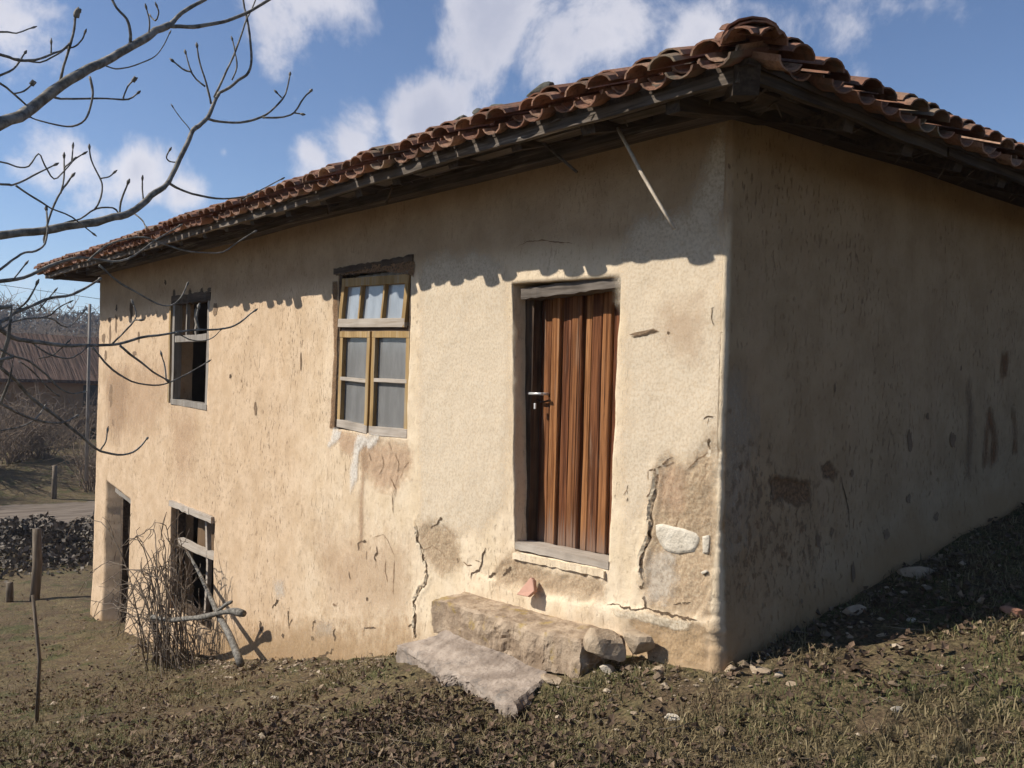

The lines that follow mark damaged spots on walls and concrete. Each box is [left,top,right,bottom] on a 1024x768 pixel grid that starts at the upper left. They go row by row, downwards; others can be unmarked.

leakage [350,435,379,535]
crack [349,519,512,638]
flaking render [420,526,459,575]
crack [609,416,714,620]
flaking render [642,447,714,615]